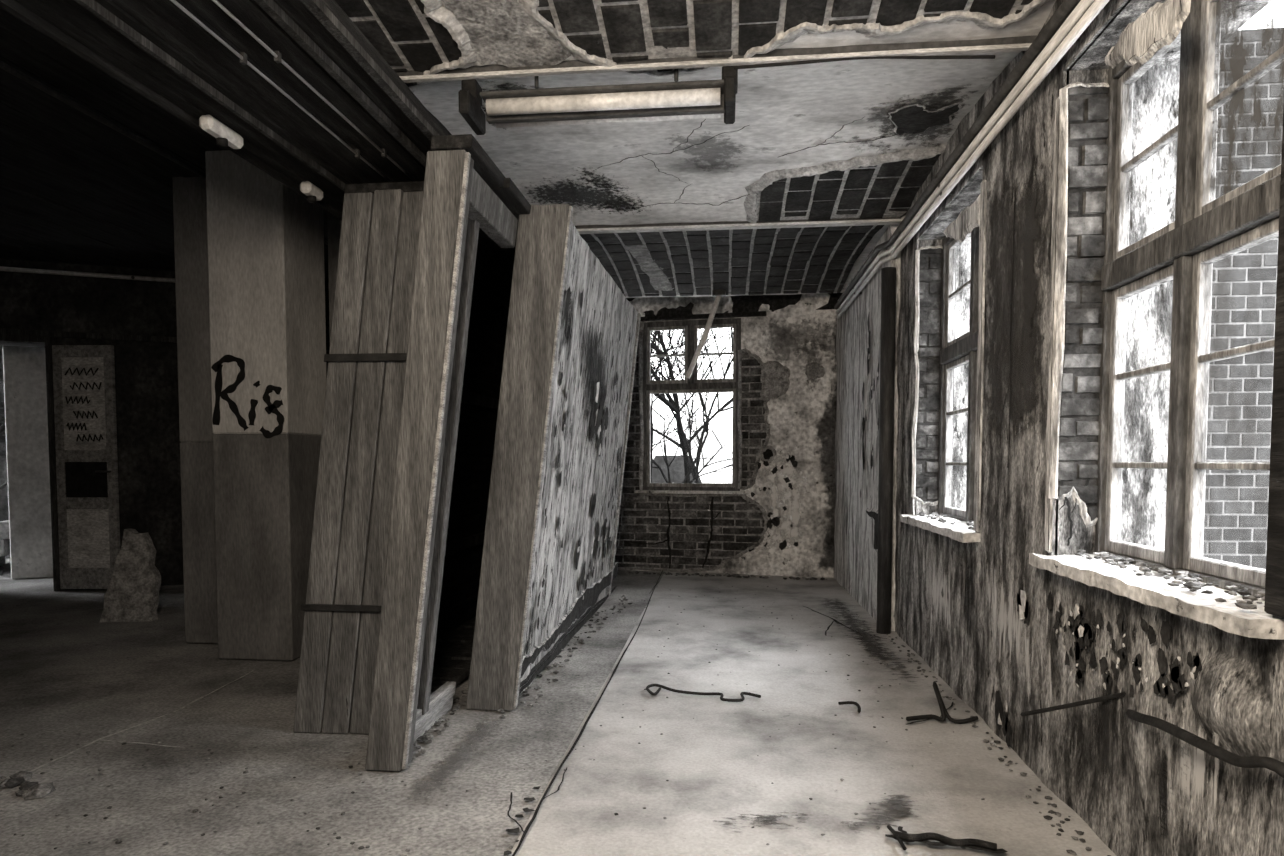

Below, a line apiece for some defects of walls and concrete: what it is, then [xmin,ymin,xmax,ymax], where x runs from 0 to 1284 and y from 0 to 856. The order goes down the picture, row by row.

flaking render [335,0,1050,93]
peeling [1105,0,1191,68]
water stain [852,85,975,153]
water stain [525,167,651,215]
flaking render [580,100,965,297]
water stain [560,287,611,460]
flaking render [1045,82,1110,553]
flaking render [519,289,825,695]
water stain [921,544,1053,703]
water stain [1089,676,1126,798]
water stain [1153,714,1219,836]